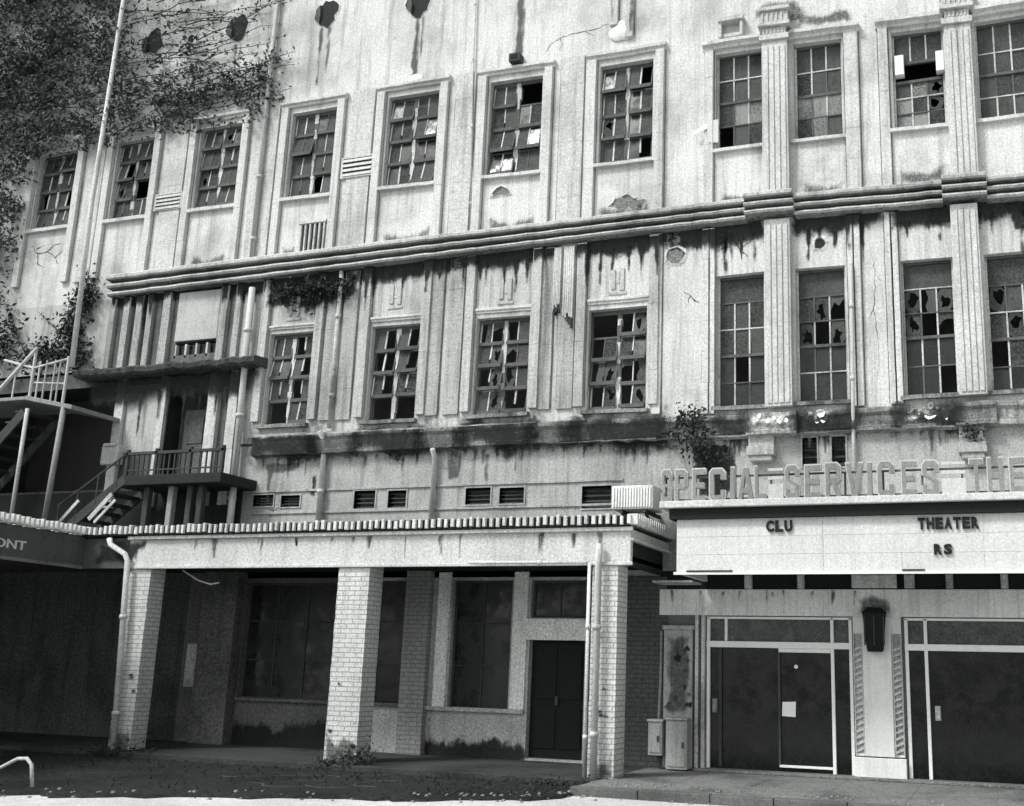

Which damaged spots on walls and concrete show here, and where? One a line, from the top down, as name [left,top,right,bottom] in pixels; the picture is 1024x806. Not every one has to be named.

water stain [318,28,331,67]
water stain [411,18,423,75]
water stain [515,0,525,54]
spalling [490,184,514,199]
spalling [608,192,648,212]
crack [32,243,62,266]
water stain [575,219,765,284]
spalling [664,245,688,266]
water stain [791,201,1024,260]
water stain [246,405,669,495]
water stain [889,398,969,451]